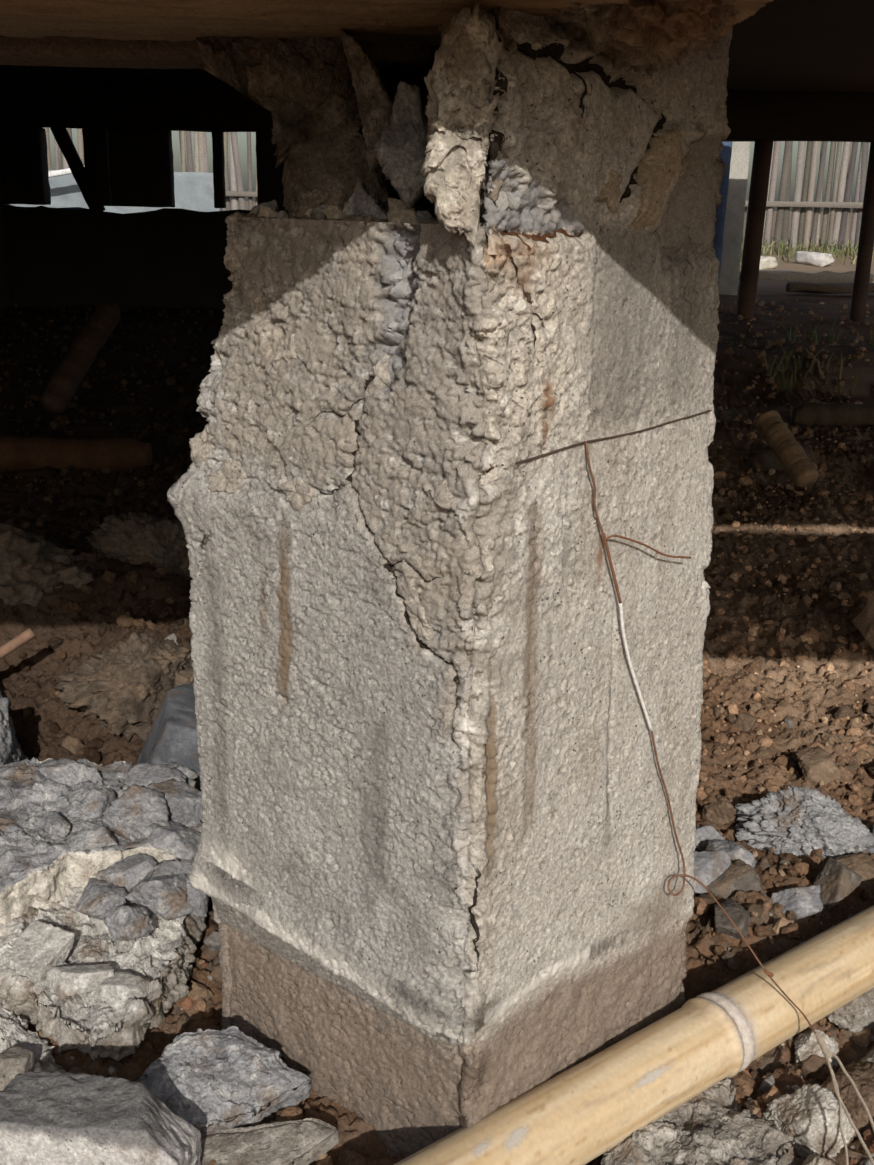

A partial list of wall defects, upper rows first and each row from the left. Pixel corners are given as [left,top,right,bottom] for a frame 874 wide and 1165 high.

crack [488,33,667,203]
crack [485,227,579,362]
crack [304,376,461,751]
spalling [189,160,585,742]
damp [462,451,496,511]
rust [543,384,554,411]
damp [189,843,591,1045]
crack [468,851,481,972]